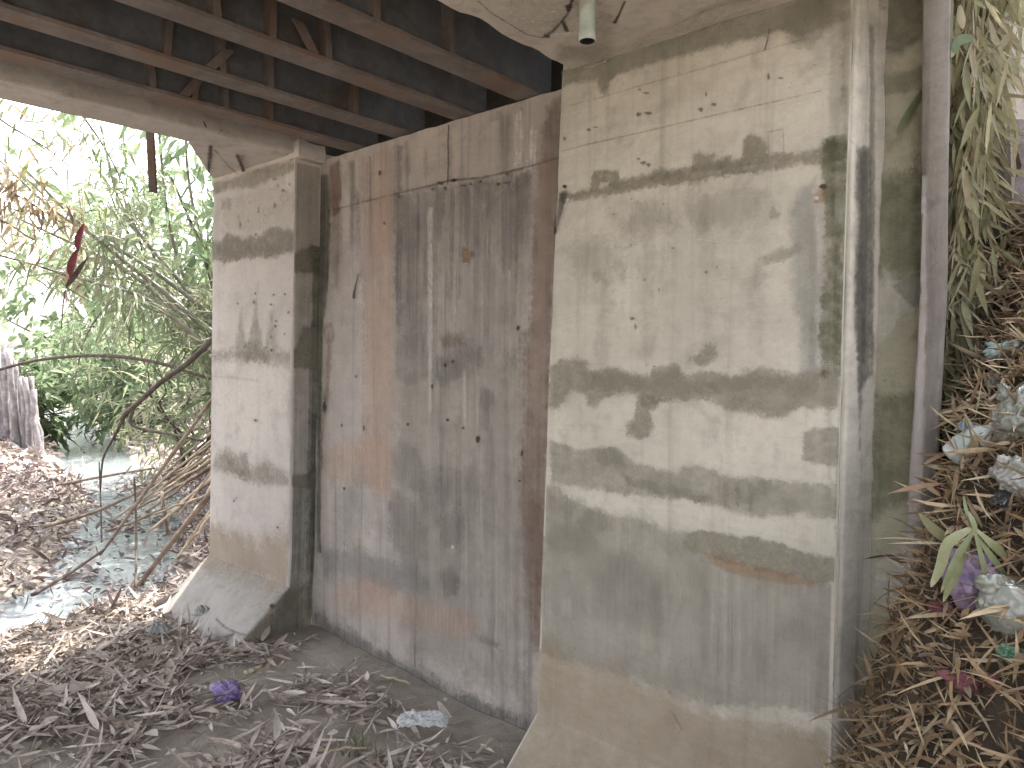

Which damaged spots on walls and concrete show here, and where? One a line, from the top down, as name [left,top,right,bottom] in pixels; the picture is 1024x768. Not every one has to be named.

leakage [561,114,875,386]
leakage [212,163,365,646]
leakage [550,347,838,439]
leakage [543,490,835,712]